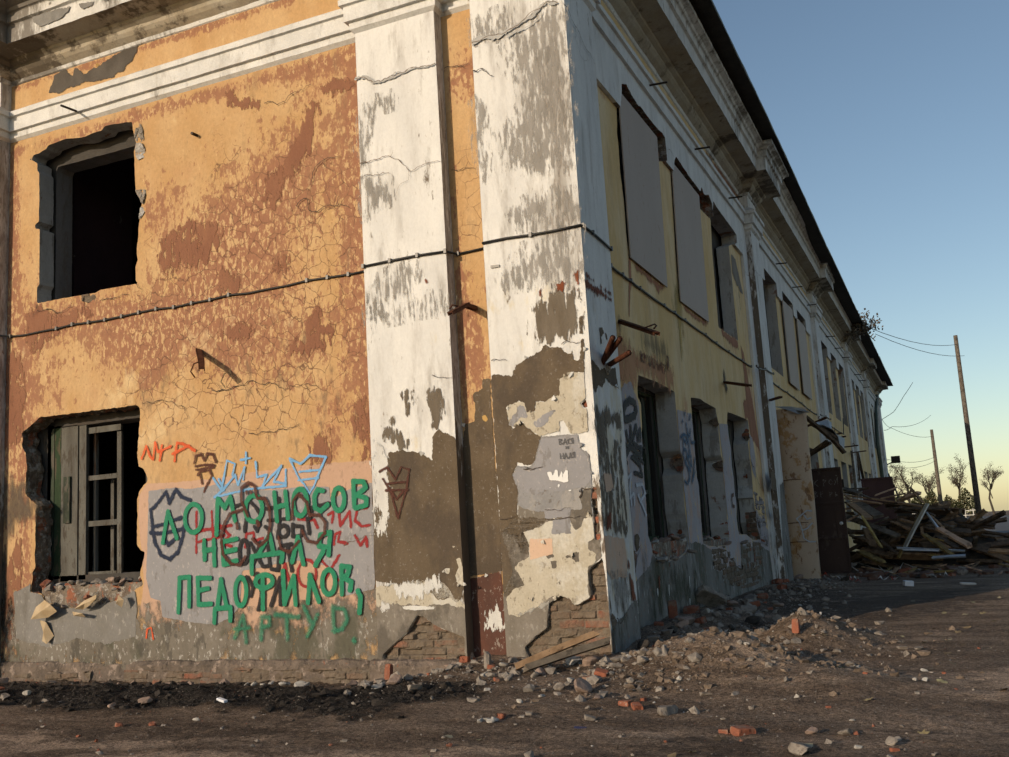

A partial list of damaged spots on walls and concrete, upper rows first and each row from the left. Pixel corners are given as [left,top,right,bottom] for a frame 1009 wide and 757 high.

crack [354,0,595,84]
peeling [225,89,260,113]
peeling [466,0,578,185]
peeling [261,77,356,211]
peeling [353,89,399,225]
peeling [156,218,224,276]
rust [557,270,612,302]
peeling [4,294,96,450]
crack [212,380,316,442]
peeling [285,303,336,359]
peeling [308,427,332,469]
peeling [351,185,641,682]